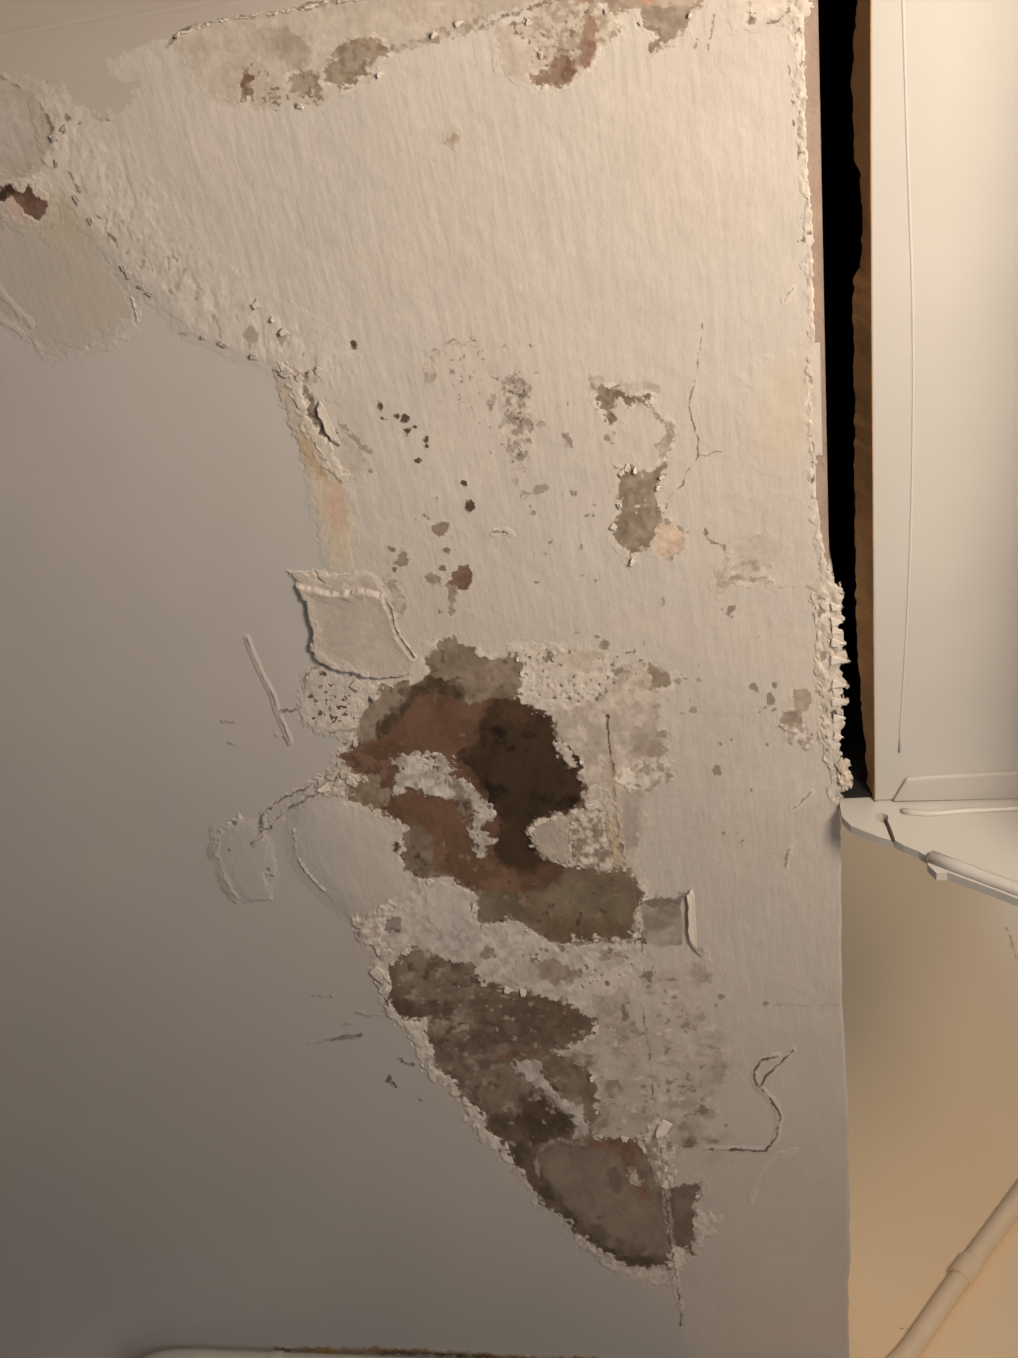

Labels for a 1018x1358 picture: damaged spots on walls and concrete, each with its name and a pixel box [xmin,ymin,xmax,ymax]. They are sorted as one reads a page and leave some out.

peeling [164,0,851,807]
crack [665,322,723,509]
spalling [282,496,748,1293]
crack [601,714,655,1105]
crack [656,1142,685,1326]
crack [701,1045,797,1154]